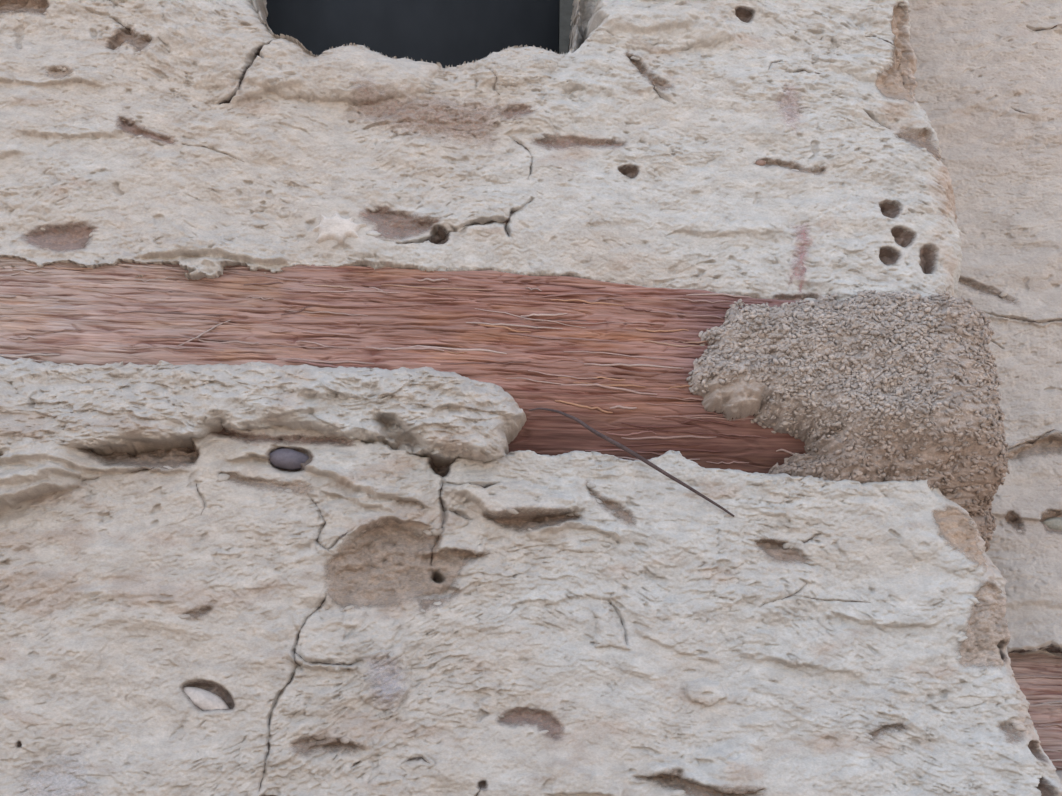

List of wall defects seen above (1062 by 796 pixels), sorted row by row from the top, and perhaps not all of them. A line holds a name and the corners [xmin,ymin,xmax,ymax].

crack [220,41,271,104]
crack [463,141,532,236]